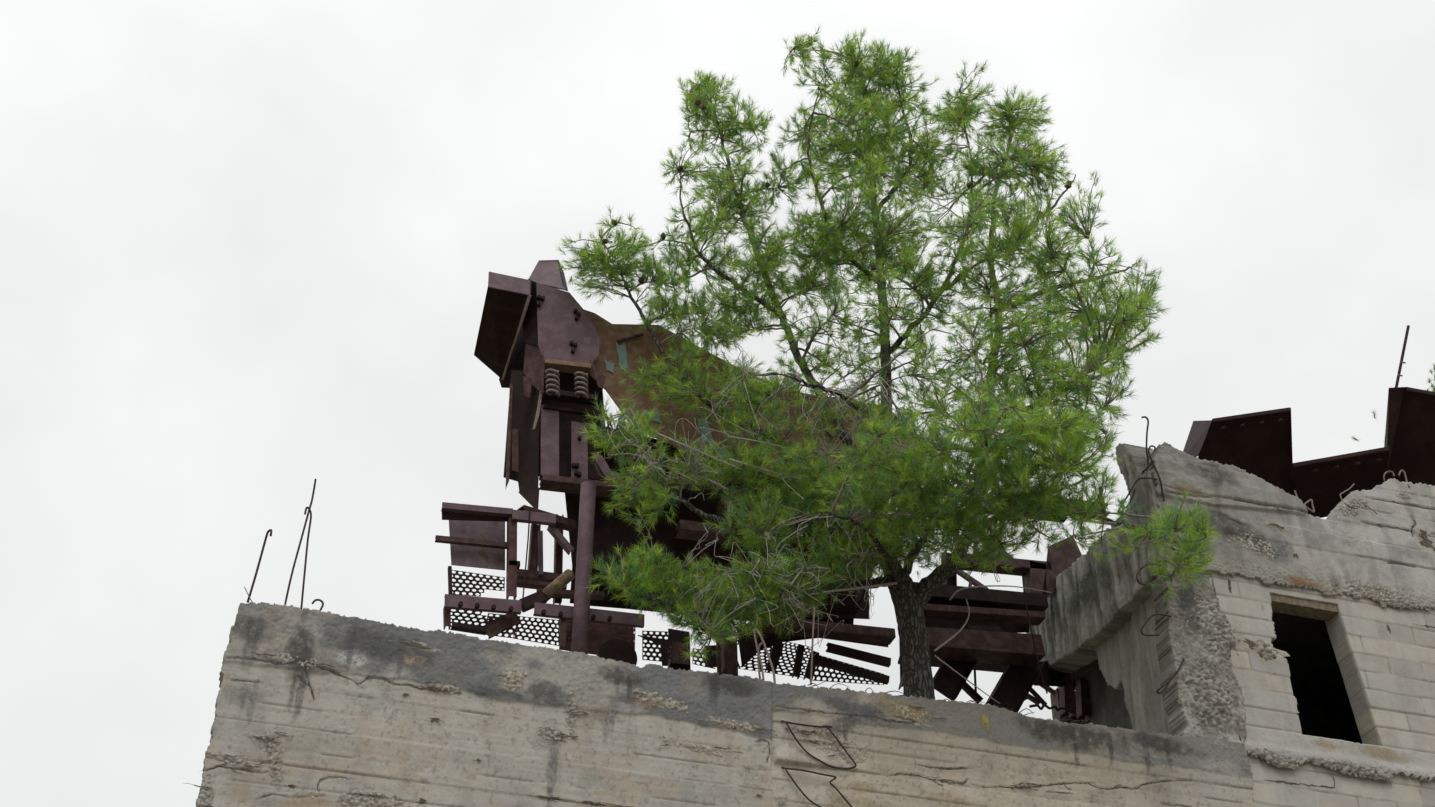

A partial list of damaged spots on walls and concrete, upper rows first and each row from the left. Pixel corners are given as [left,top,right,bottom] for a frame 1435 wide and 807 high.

spalling [1118,416,1165,512]
spalling [1338,483,1377,518]
spalling [1383,470,1412,500]
spalling [244,529,272,603]
spalling [284,479,324,610]
spalling [1225,521,1299,562]